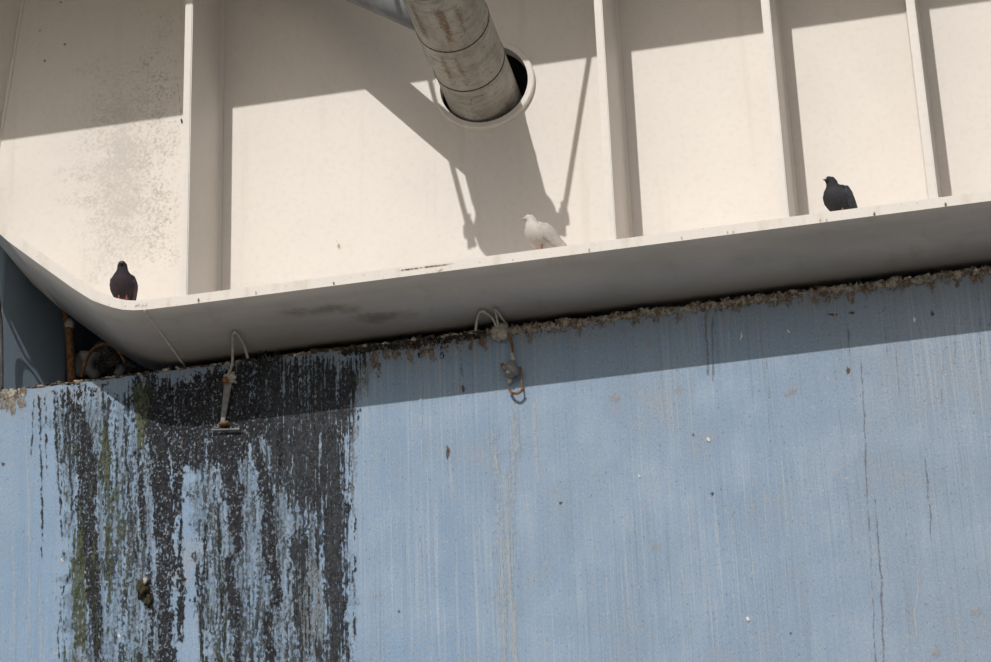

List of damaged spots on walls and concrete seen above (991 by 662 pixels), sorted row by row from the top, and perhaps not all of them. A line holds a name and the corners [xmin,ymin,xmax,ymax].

water stain [30,351,371,662]